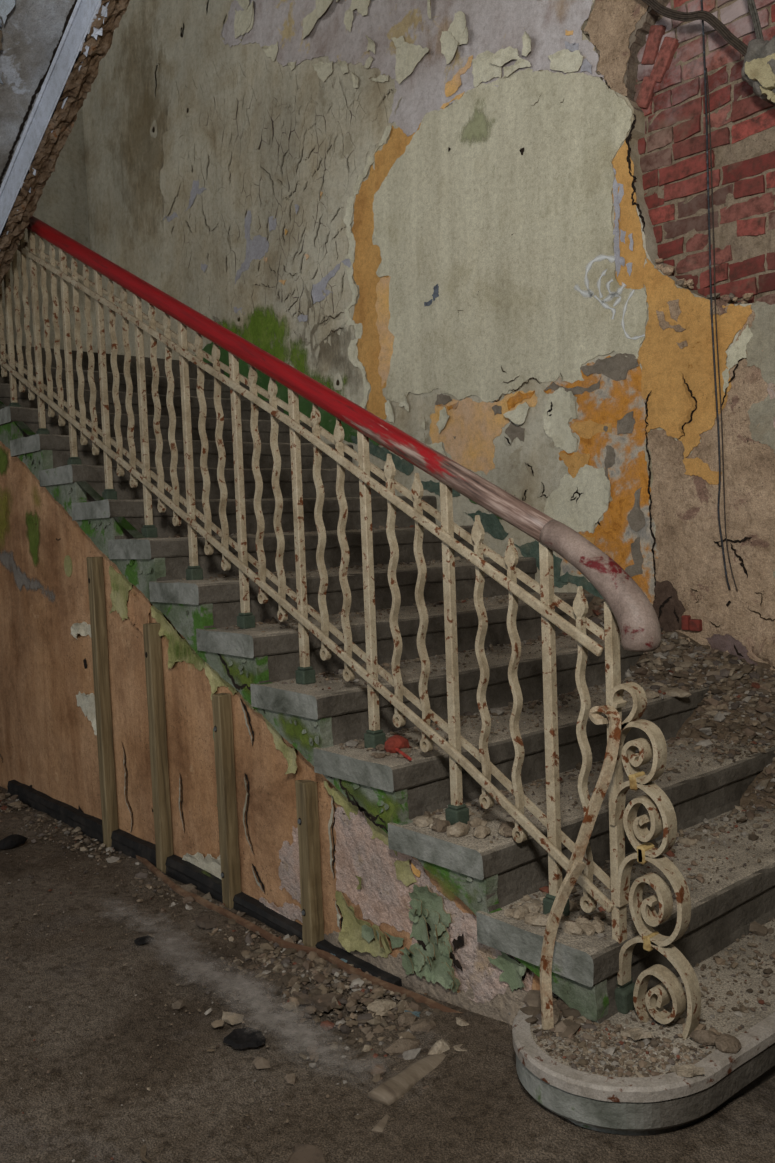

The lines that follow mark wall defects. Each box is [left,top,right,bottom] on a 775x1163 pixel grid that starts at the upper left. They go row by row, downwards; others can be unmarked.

spalling [0,0,130,286]
crack [162,88,402,323]
crack [217,653,265,713]
flaking render [221,0,775,670]
crack [645,390,720,627]
crack [677,358,746,440]
crack [714,537,775,621]
crack [328,776,388,832]
flaking render [324,781,534,1026]